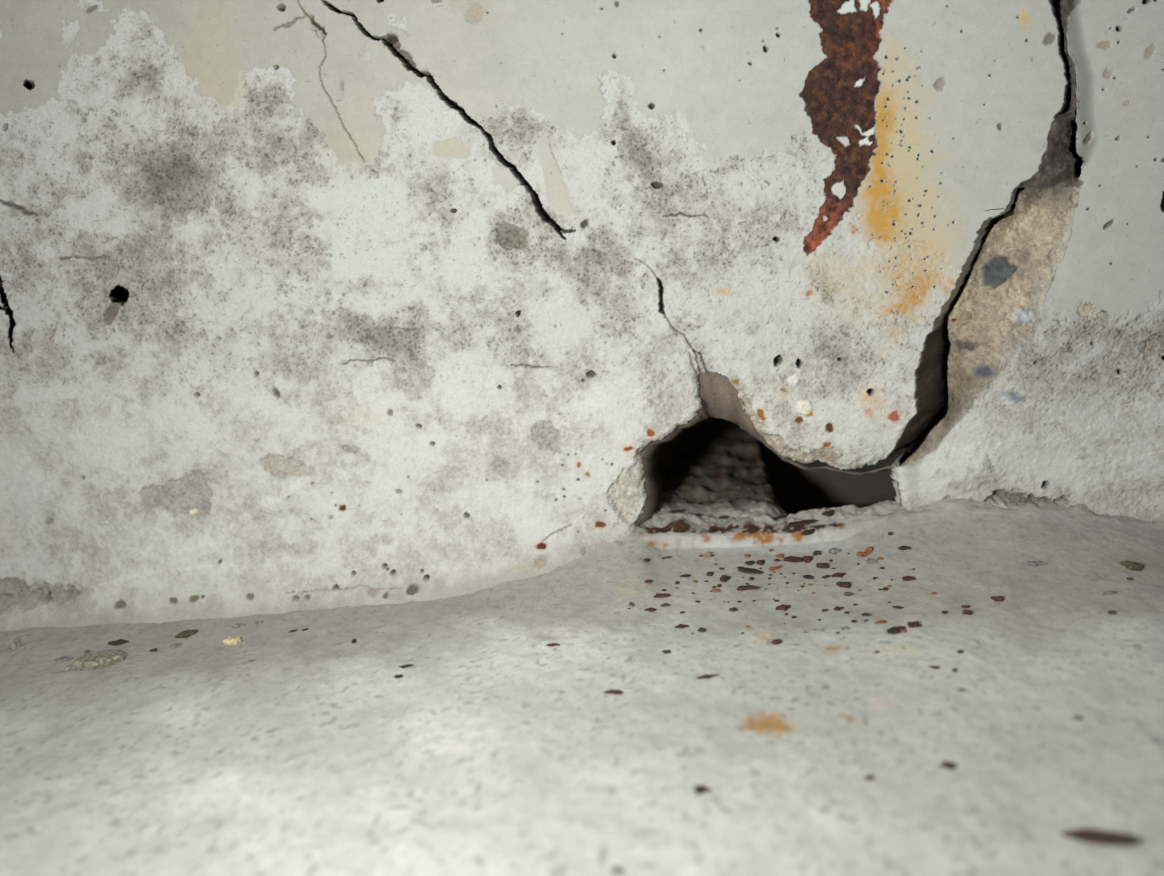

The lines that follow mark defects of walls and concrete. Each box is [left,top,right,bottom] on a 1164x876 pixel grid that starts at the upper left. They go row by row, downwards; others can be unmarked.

crack [272,0,576,239]
crack [999,0,1085,217]
crack [0,199,37,215]
rust [787,0,981,366]
crack [0,276,16,351]
crack [635,257,707,374]
spalling [727,372,853,469]
rust [852,379,901,423]
rust [644,580,671,612]
rust [636,502,876,592]
rust [856,546,884,560]